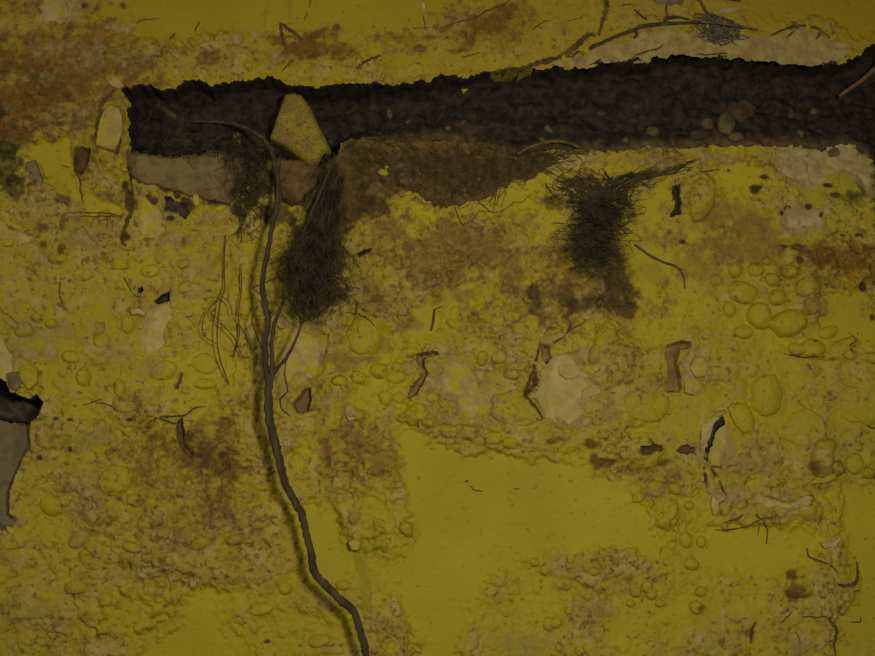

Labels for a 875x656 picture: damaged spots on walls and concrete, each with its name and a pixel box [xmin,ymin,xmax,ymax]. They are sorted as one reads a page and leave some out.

spalling [69,22,875,250]
spalling [531,338,614,430]
spalling [0,420,31,534]